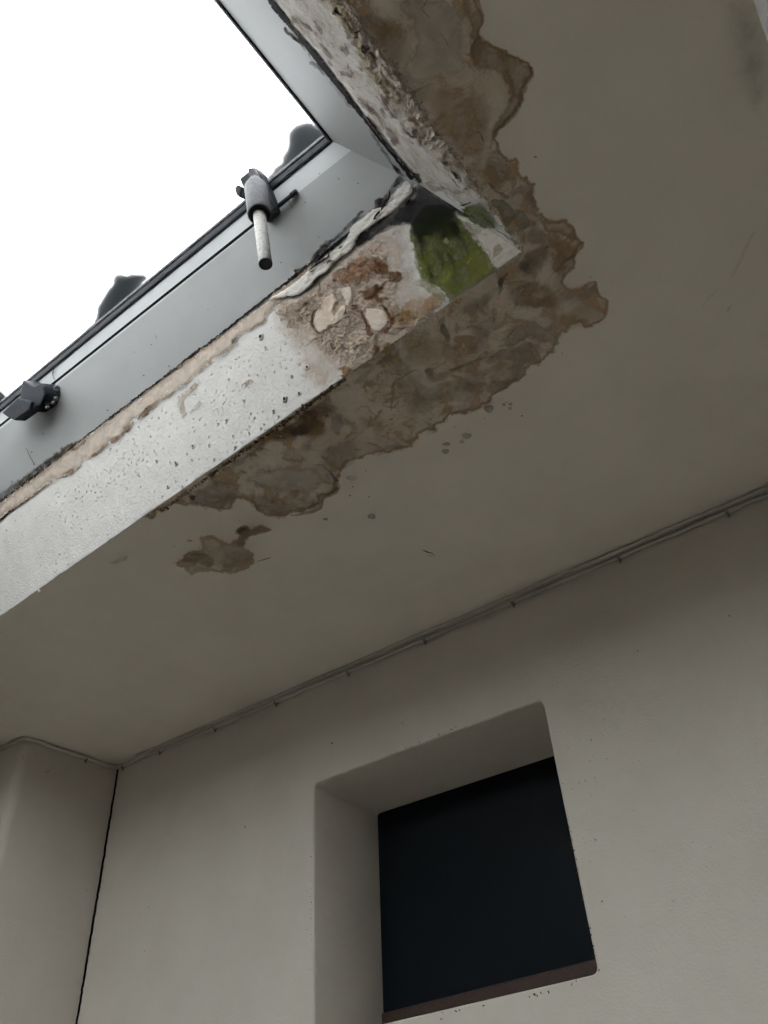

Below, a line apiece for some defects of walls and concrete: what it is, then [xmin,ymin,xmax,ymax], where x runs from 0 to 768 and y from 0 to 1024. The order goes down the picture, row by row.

flaking render [152,181,443,518]
damp [0,0,609,575]
flaking render [322,0,524,268]
crack [75,769,119,1024]